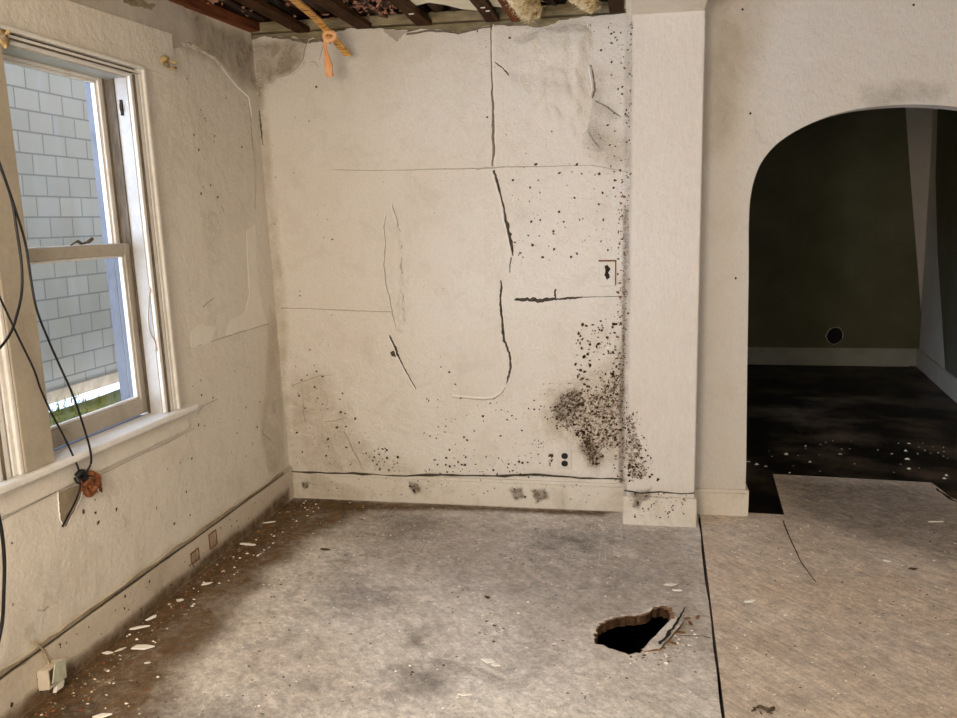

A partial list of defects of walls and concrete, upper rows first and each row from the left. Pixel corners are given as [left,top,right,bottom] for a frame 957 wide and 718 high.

crack [332,25,628,400]
water stain [23,316,687,718]